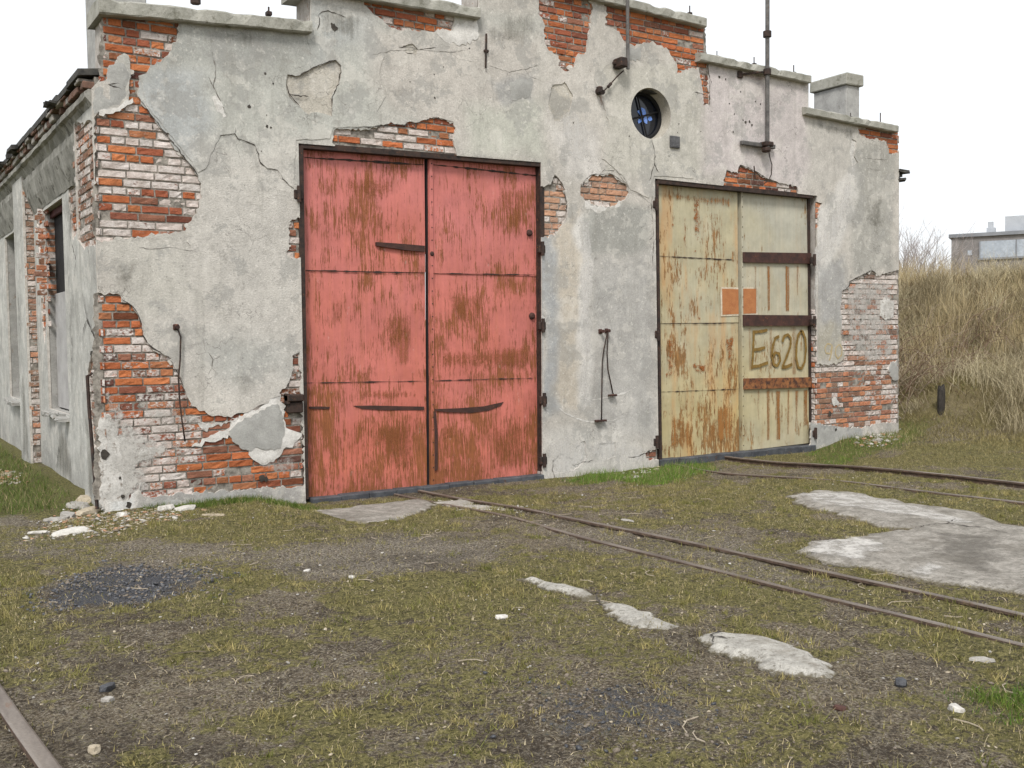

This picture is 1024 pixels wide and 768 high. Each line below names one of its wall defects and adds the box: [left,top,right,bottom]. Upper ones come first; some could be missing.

spalling [70,17,202,247]
crack [209,54,292,187]
spalling [332,118,456,155]
spalling [364,3,454,32]
spalling [544,176,567,237]
spalling [580,175,628,207]
spalling [538,0,726,124]
spalling [723,165,797,193]
spalling [849,126,898,165]
spalling [21,183,51,463]
spalling [90,293,303,509]
spalling [815,270,900,431]